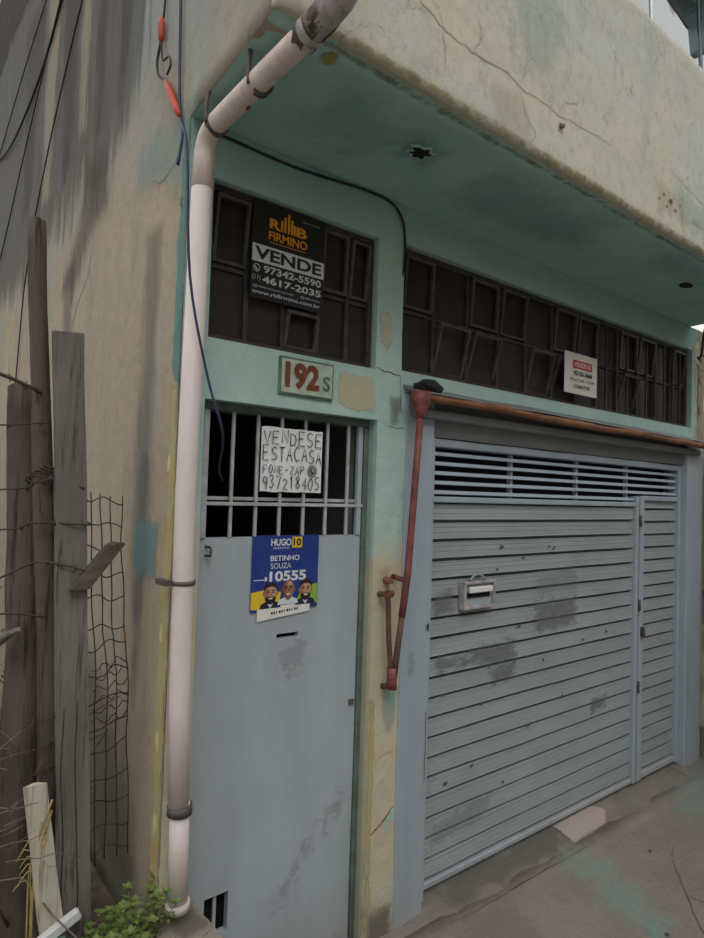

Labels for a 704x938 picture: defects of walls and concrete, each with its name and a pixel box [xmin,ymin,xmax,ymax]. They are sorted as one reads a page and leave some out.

crack [421,1,609,144]
damp [0,0,145,303]
hole [405,143,437,161]
peeling [338,373,375,410]
crack [672,845,704,933]